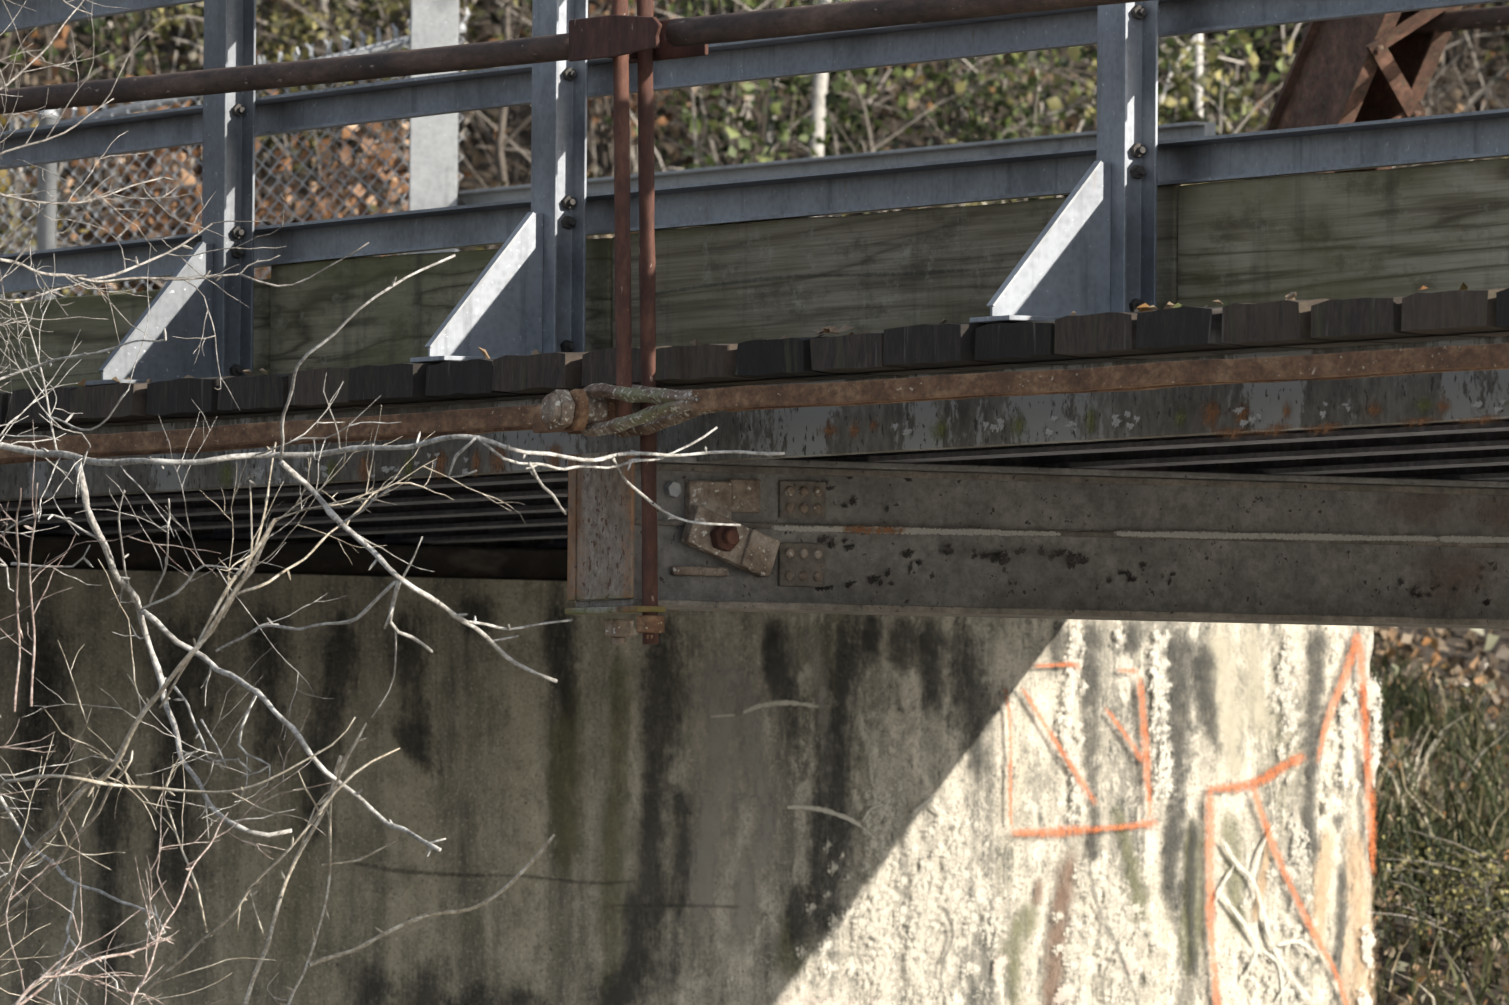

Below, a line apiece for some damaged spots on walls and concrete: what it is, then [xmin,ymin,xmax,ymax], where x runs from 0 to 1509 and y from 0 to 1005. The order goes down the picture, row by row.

rust [548,446,560,466]
peeling [983,418,1005,432]
peeling [1111,411,1140,431]
peeling [1232,407,1261,427]
damp [465,599,491,631]
damp [12,629,75,832]
damp [97,762,135,981]
damp [149,619,219,904]
damp [782,617,996,1005]
damp [1050,621,1144,917]
damp [1165,630,1218,973]
damp [1303,630,1330,861]